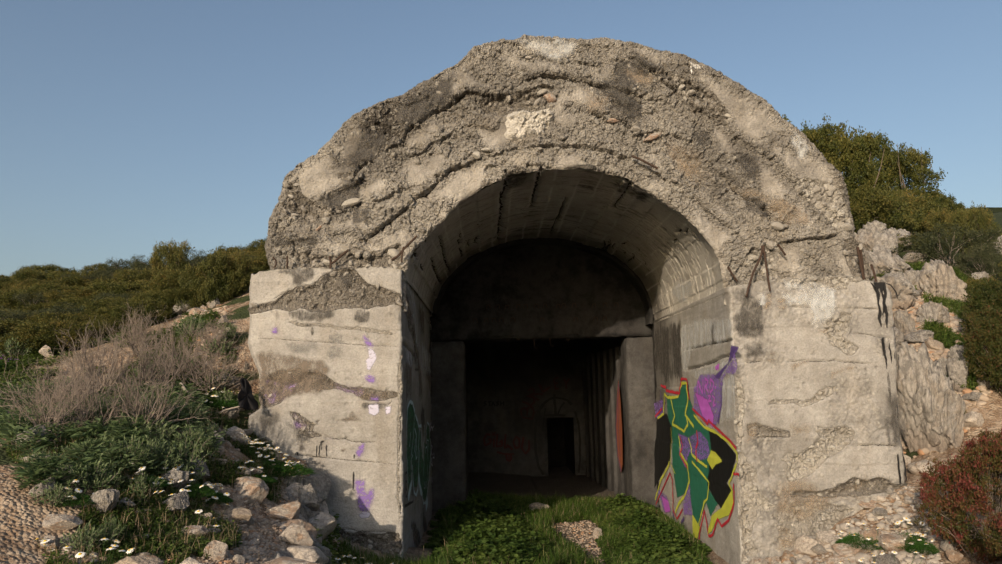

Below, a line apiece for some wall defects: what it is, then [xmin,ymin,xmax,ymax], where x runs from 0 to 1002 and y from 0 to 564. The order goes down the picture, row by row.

spalling [480,91,542,116]
spalling [650,68,733,126]
spalling [280,178,334,223]
spalling [248,235,418,356]
crack [357,140,465,244]
crack [413,75,639,297]
spalling [727,177,877,297]
spalling [259,355,404,521]
spalling [732,376,908,562]
spalling [336,529,402,558]